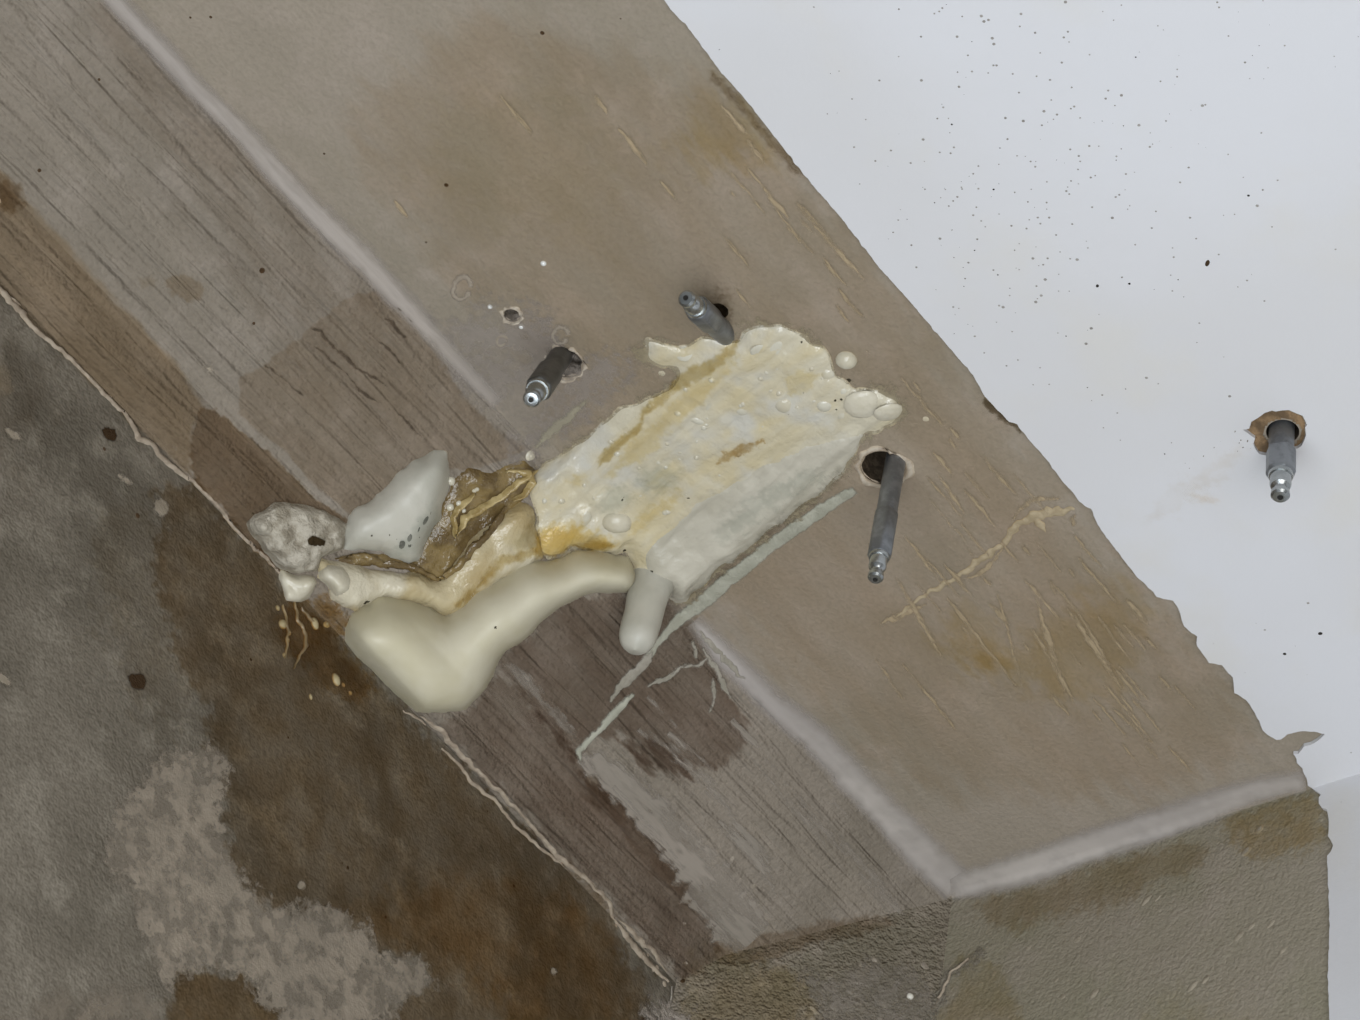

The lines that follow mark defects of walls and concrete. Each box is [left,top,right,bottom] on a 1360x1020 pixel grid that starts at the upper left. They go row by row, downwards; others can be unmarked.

crack [0,286,280,574]
crack [313,308,416,432]
efflorescence [104,741,438,1020]
crack [403,710,673,1003]
damp [578,751,767,947]